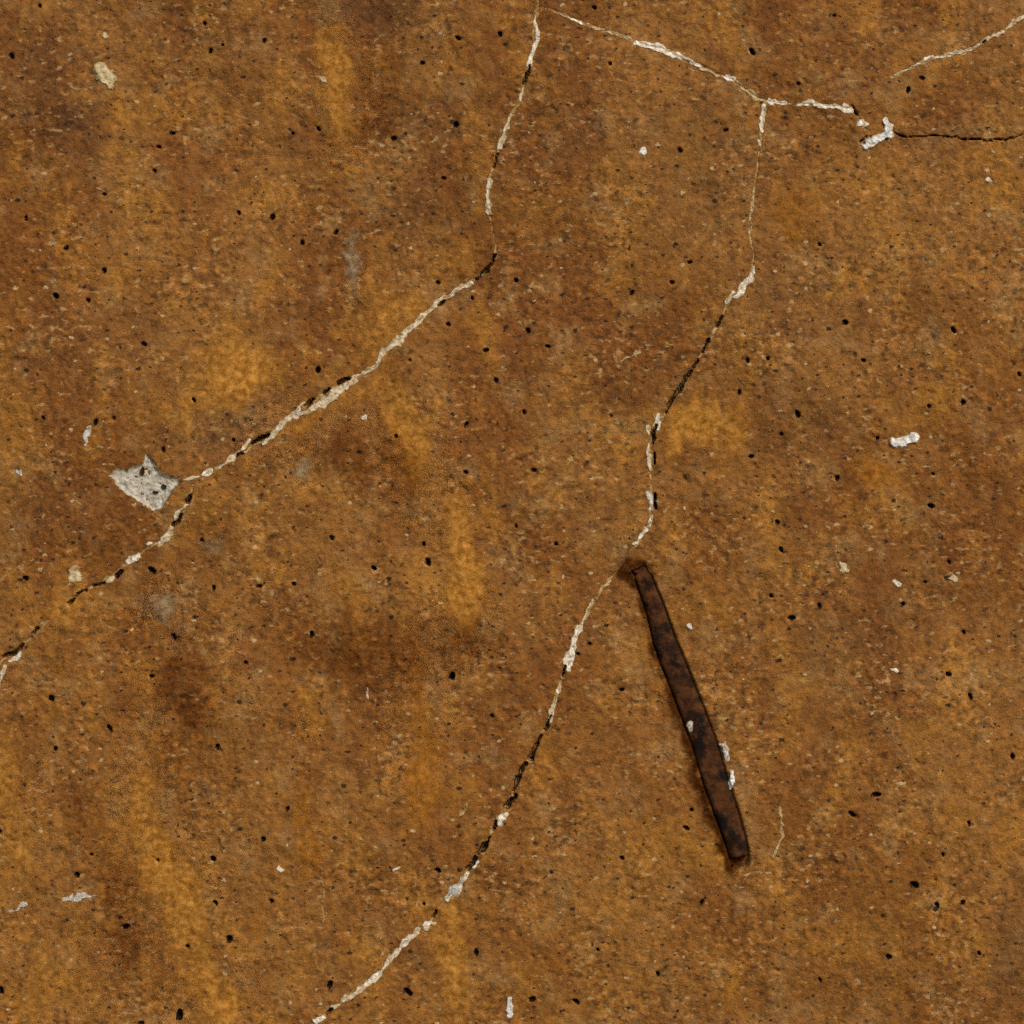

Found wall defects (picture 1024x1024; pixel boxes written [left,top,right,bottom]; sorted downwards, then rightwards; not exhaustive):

crack [889,14,1024,79]
crack [894,132,1024,142]
spalling [108,454,181,512]
crack [61,0,869,1024]
crack [0,616,55,682]
rust [617,558,748,871]